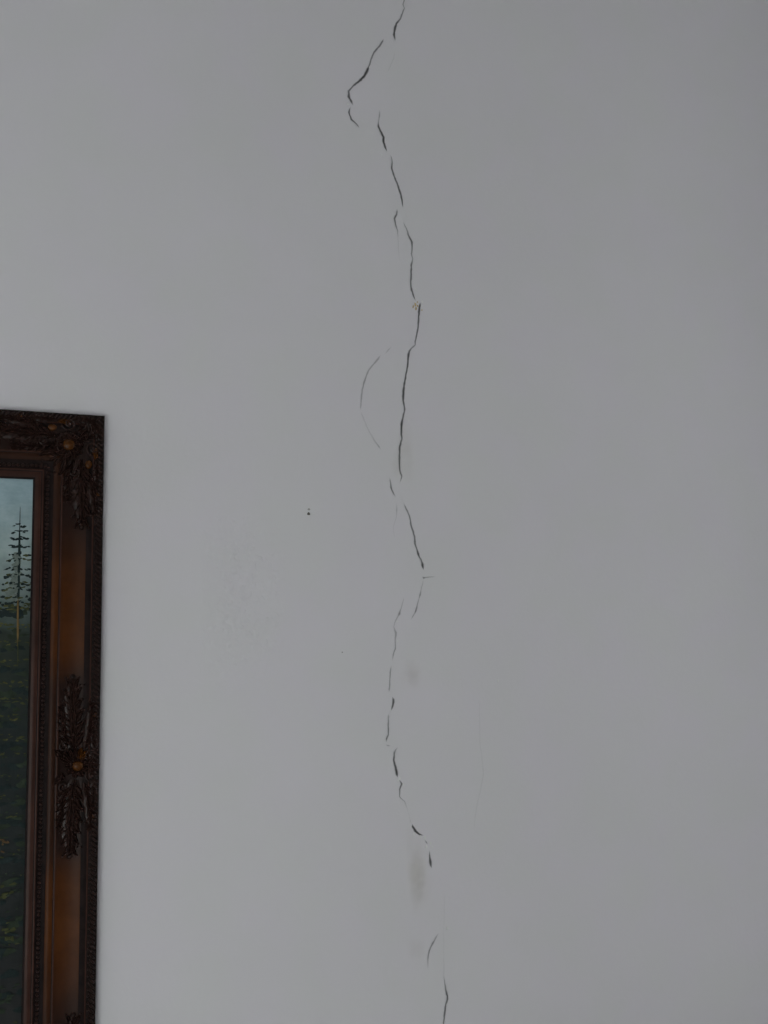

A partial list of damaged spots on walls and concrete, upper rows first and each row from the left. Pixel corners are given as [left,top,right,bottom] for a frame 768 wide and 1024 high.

crack [347,13,423,492]
crack [386,699,404,791]
crack [412,825,433,866]